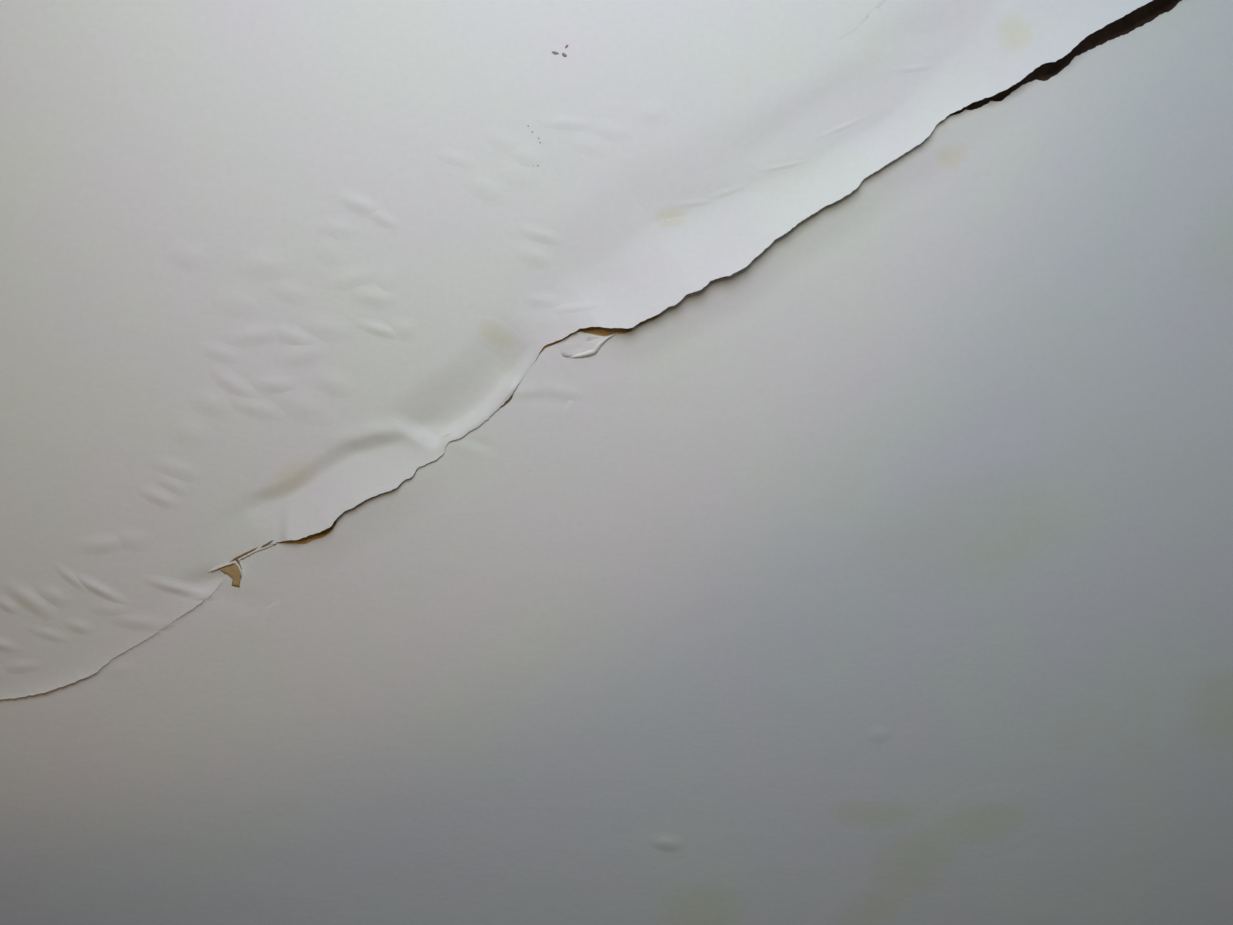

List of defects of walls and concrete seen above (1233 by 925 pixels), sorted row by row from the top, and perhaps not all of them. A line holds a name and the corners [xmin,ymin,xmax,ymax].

peeling [483,0,1153,359]
peeling [173,389,423,594]